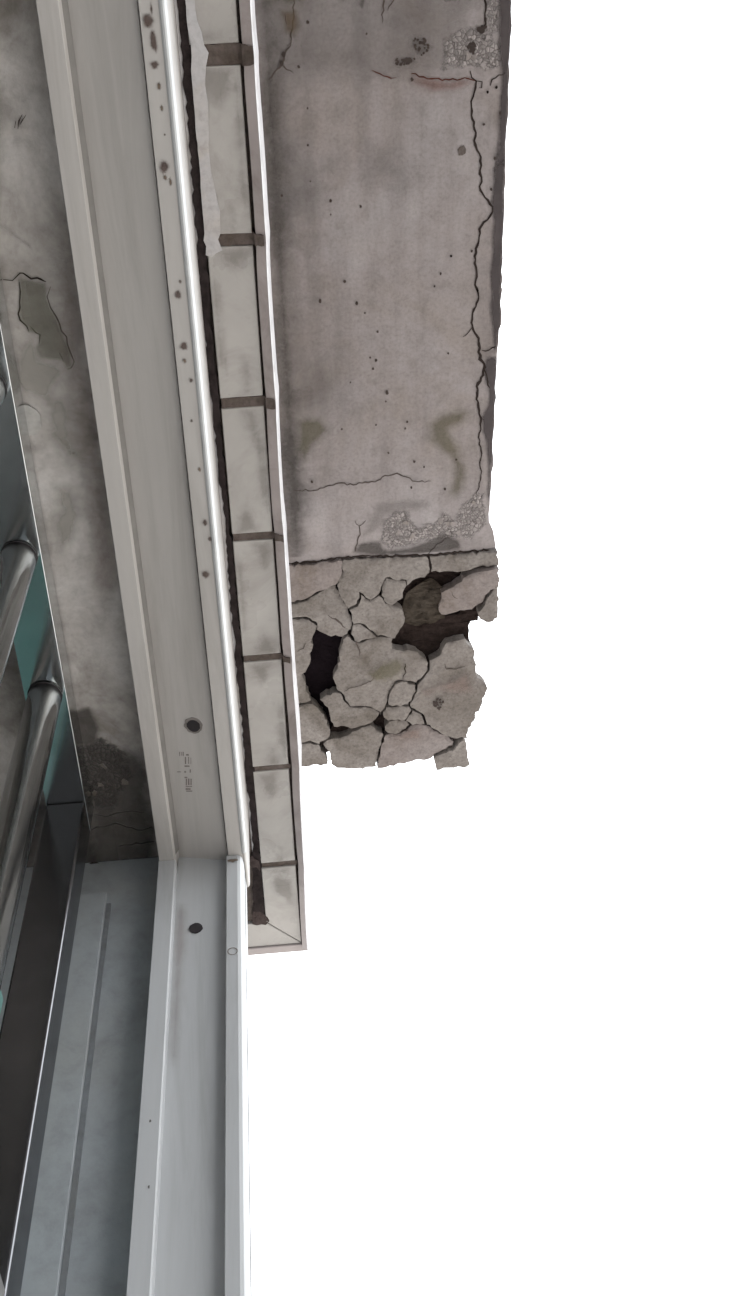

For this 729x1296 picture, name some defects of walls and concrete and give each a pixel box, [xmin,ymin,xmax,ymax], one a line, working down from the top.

flaking render [395,0,500,82]
crack [372,70,505,495]
crack [294,473,427,492]
flaking render [381,493,486,549]
spalling [391,570,478,661]
spalling [373,715,385,732]
leakage [78,710,151,863]